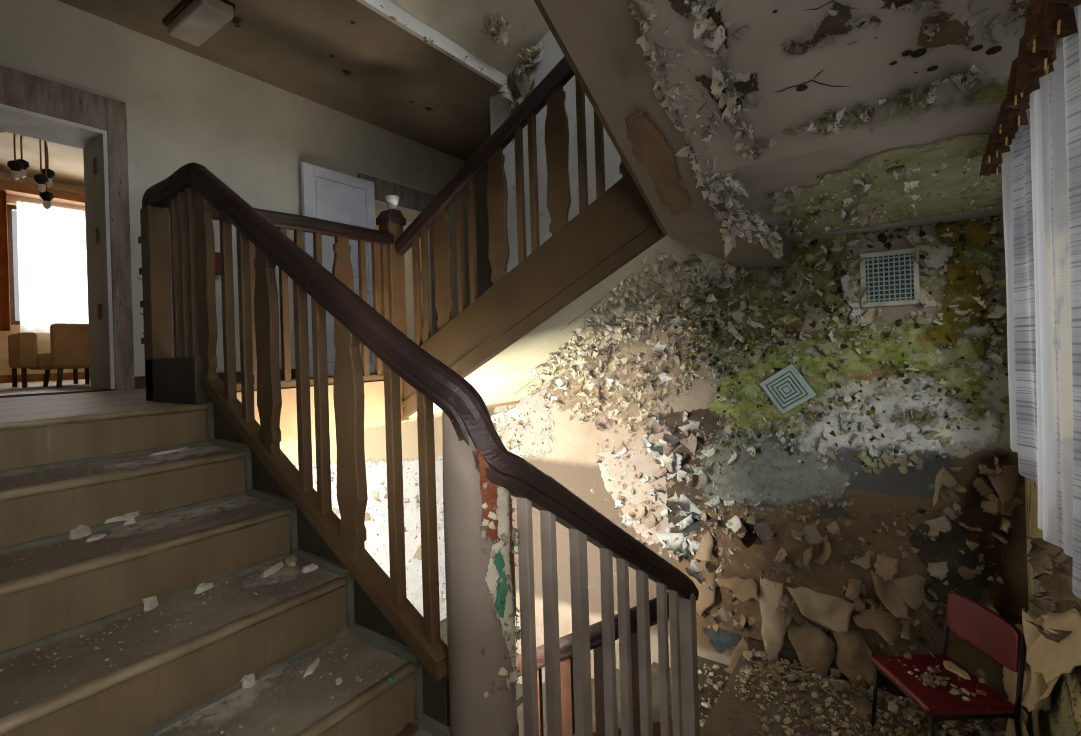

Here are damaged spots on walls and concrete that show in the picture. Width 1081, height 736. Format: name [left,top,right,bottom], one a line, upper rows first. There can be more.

peeling [481,12,544,113]
crack [772,69,849,93]
damp [784,133,1003,232]
peeling [491,0,1032,701]
peeling [475,448,522,698]
peeling [1023,535,1081,614]
peeling [1024,619,1073,643]